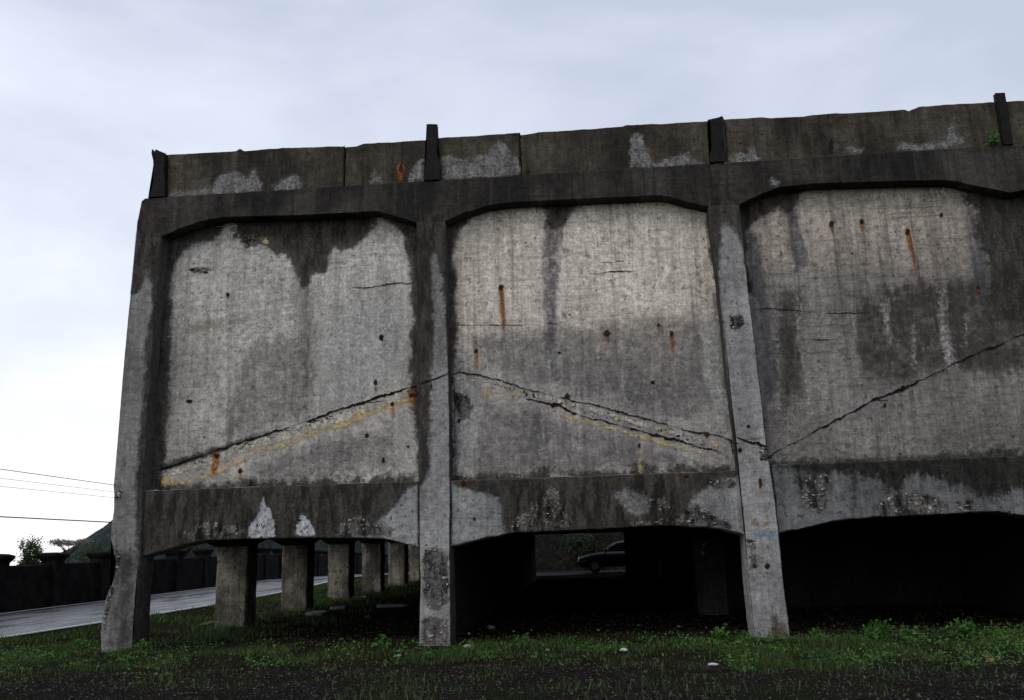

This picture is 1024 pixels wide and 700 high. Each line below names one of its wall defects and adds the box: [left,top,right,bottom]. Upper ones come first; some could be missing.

damp [440,141,521,179]
damp [630,133,704,167]
corrosion [905,228,914,260]
damp [706,180,810,407]
crack [753,306,883,314]
damp [858,192,1024,379]
damp [114,205,738,649]
crack [153,333,1024,477]
peeling [184,497,275,540]
spalling [508,486,572,532]
spalling [421,546,449,646]